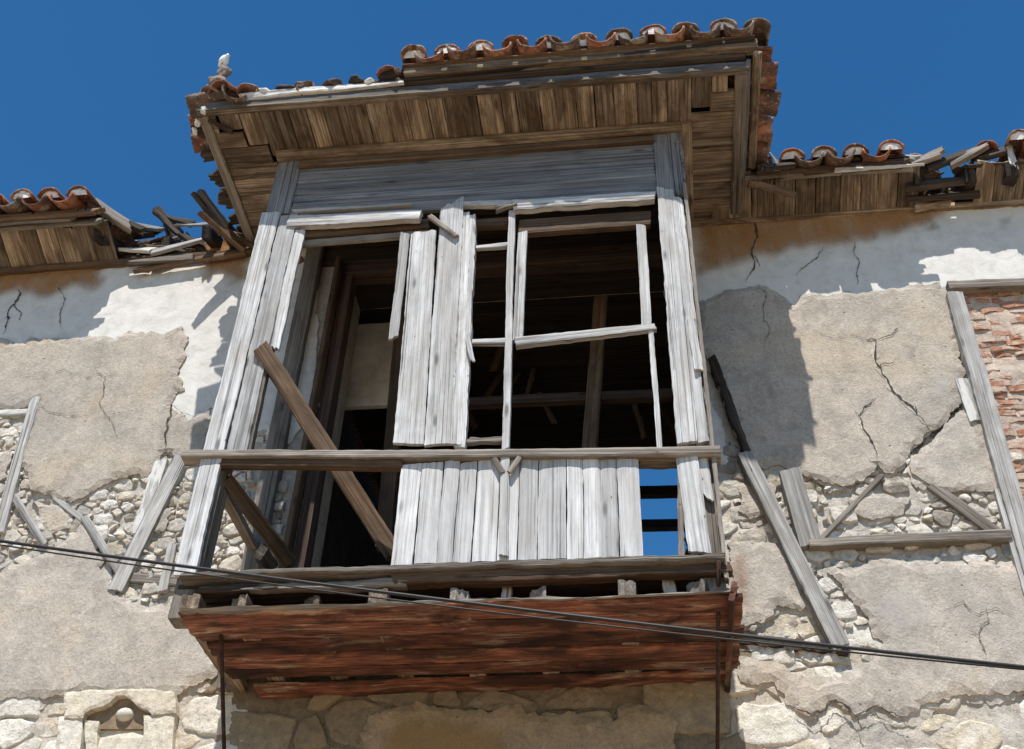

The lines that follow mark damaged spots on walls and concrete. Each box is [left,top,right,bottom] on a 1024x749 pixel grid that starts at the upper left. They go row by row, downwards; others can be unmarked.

crack [4,289,22,332]
crack [746,222,770,347]
damp [699,199,942,270]
crack [37,367,128,438]
crack [814,326,962,456]
spalling [964,292,1024,500]
spalling [0,408,151,582]
spalling [116,466,199,609]
spalling [175,429,1024,749]
crack [947,601,1017,651]